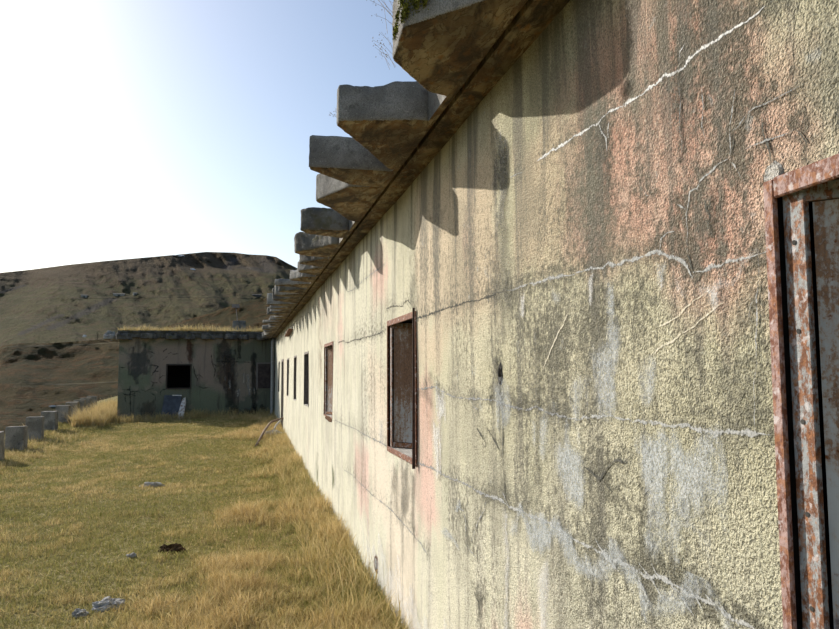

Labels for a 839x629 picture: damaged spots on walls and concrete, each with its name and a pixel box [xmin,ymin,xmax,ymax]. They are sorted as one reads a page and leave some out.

crack [510,1,772,178]
water stain [217,338,265,415]
crack [386,86,807,629]
water stain [598,328,618,410]